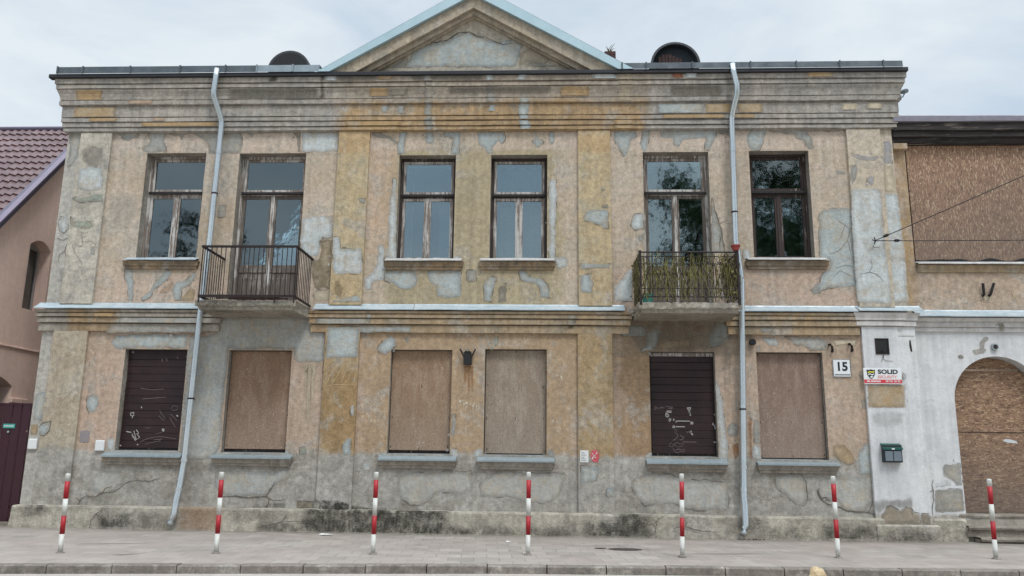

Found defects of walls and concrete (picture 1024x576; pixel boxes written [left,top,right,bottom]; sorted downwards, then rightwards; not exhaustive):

flaking render [311,236,352,298]
crack [833,222,882,279]
crack [76,478,160,555]
water stain [101,513,165,528]
crack [223,482,307,528]
water stain [267,500,470,534]
water stain [586,514,648,536]
water stain [825,526,874,539]